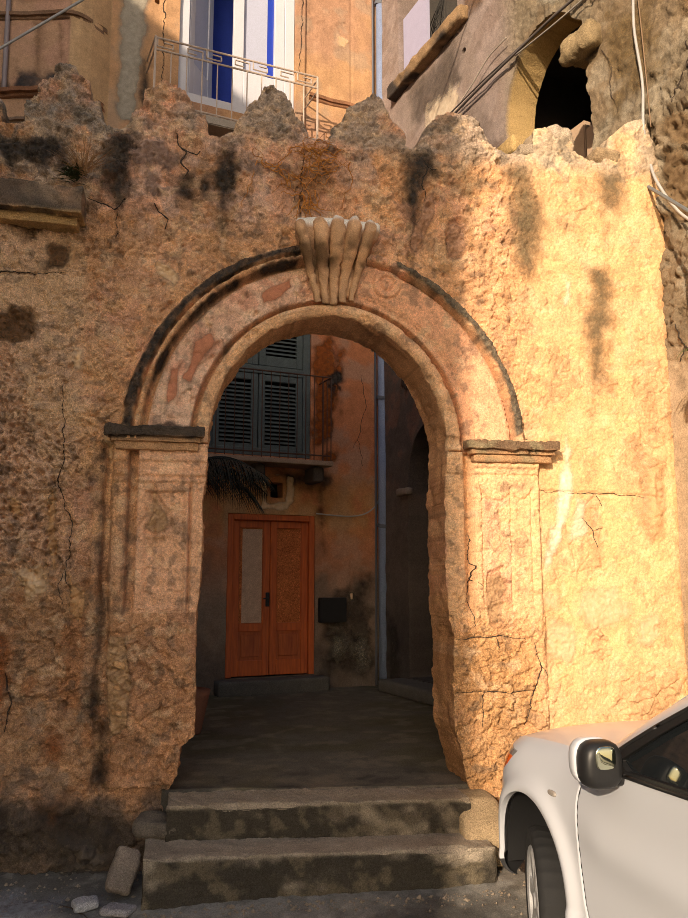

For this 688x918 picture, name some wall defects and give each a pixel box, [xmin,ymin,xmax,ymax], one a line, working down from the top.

crack [159,0,167,81]
crack [176,133,200,178]
water stain [588,269,610,367]
crack [47,386,79,622]
efflorescence [545,446,584,566]
crack [542,490,645,506]
crack [456,535,548,727]
water stain [0,805,134,873]